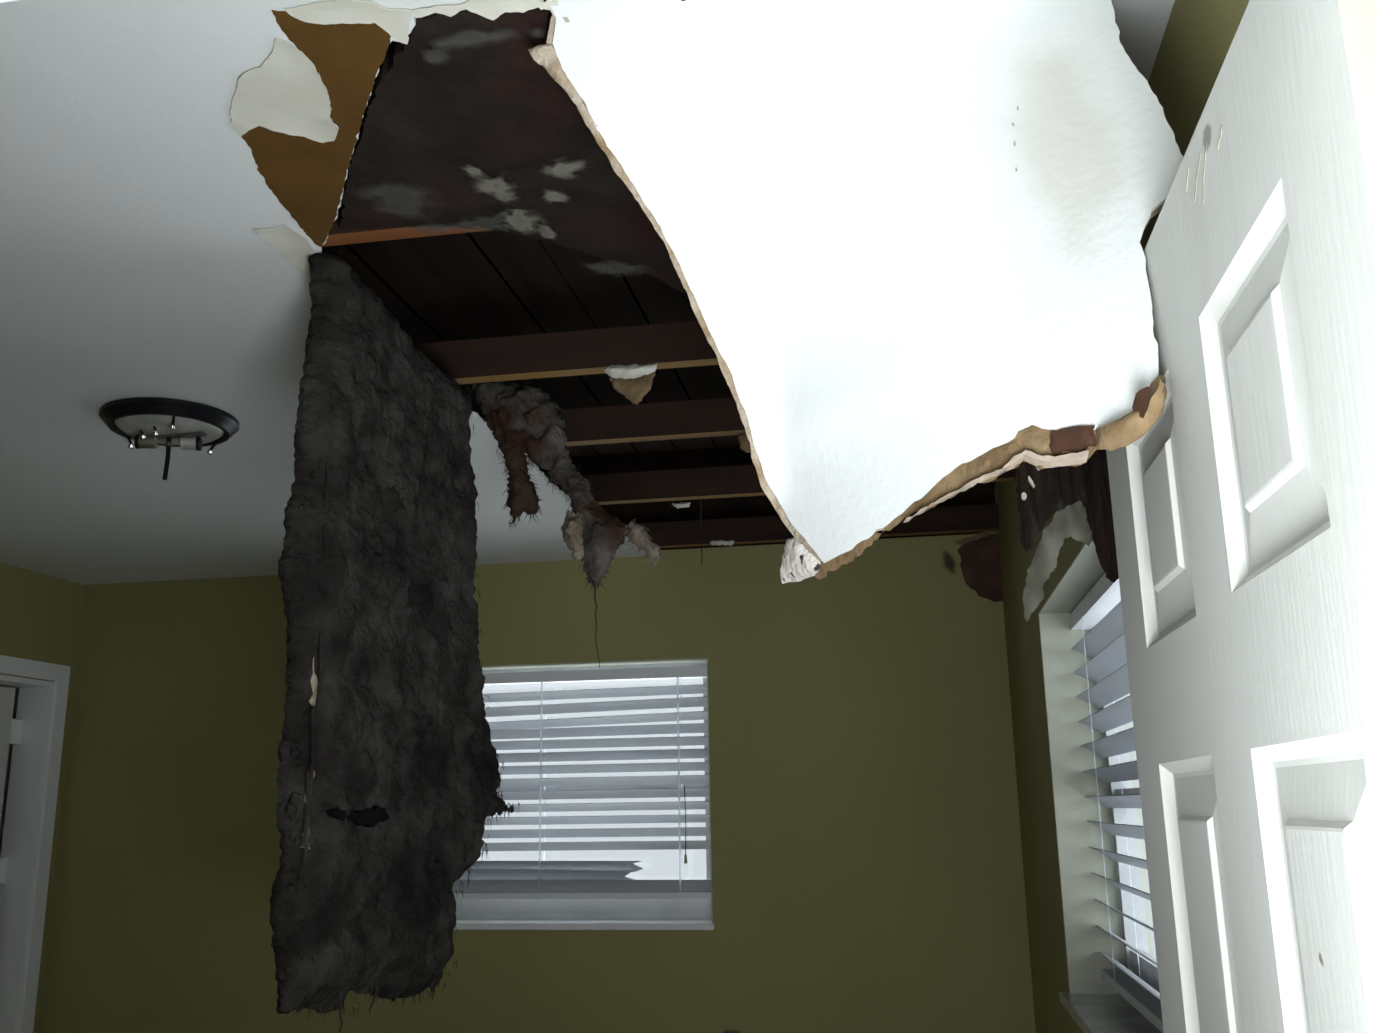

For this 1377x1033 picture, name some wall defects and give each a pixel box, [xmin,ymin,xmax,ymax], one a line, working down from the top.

mould [426,31,506,62]
mould [363,167,555,238]
mould [545,161,583,202]
damp [588,263,636,273]
spalling [780,537,821,584]
peeling [958,533,1003,602]